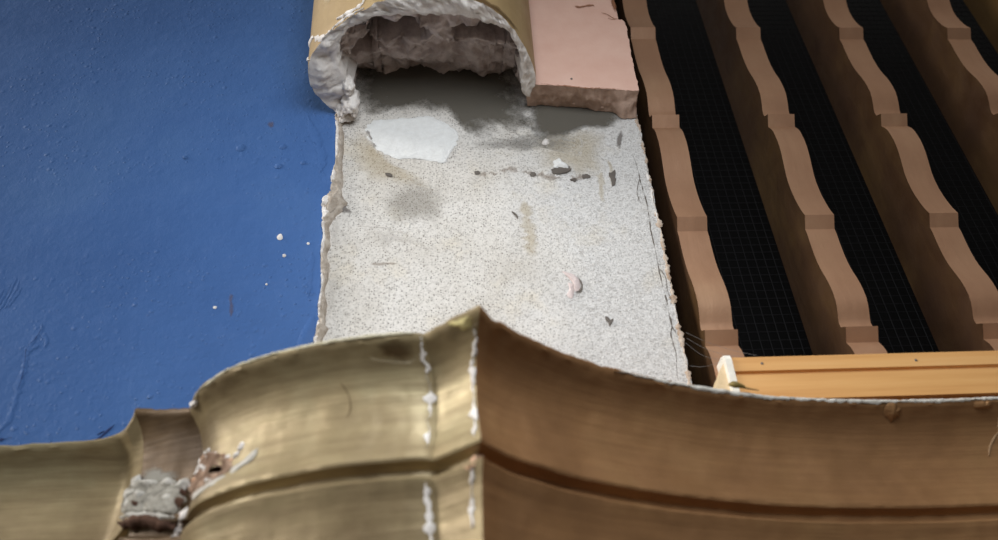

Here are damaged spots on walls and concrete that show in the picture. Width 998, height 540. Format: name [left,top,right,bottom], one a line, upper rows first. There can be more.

spalling [307,0,536,123]
spalling [365,116,459,163]
spalling [551,158,571,174]
crack [988,425,998,456]
spalling [116,442,258,537]